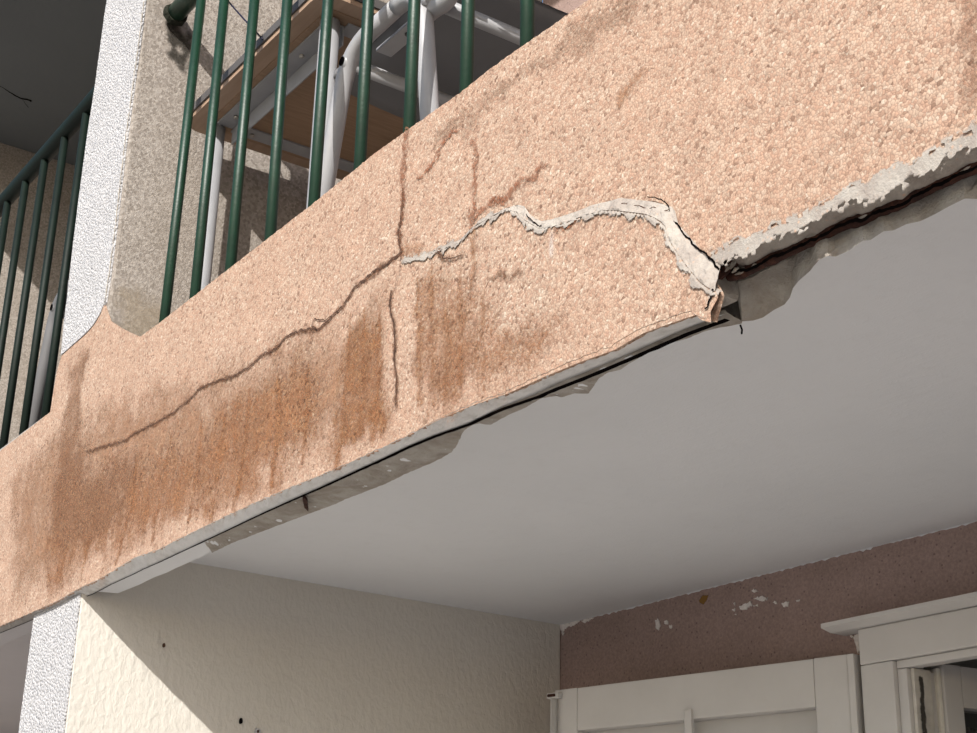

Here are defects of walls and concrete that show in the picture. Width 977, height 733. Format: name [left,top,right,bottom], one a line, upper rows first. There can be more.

leakage [14,331,374,585]
crack [86,127,977,596]
spalling [205,120,977,553]
peeling [732,589,800,615]